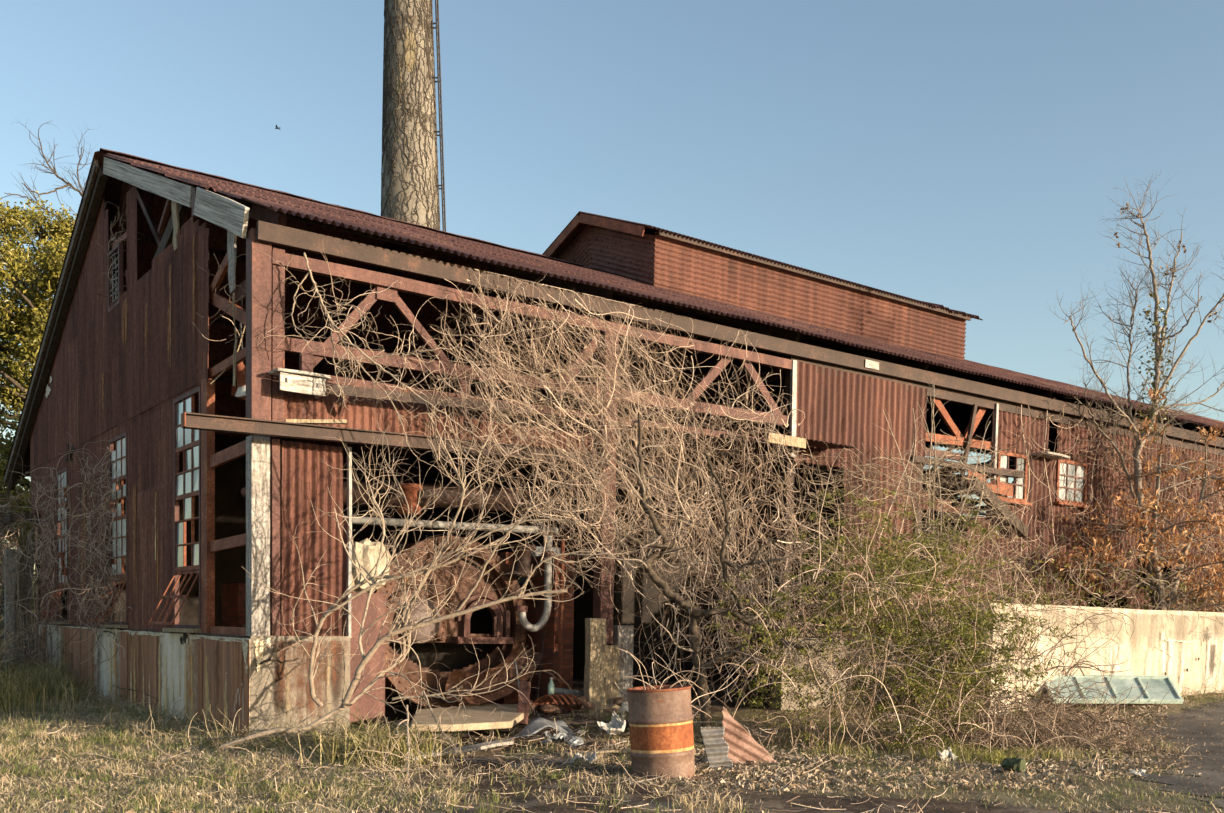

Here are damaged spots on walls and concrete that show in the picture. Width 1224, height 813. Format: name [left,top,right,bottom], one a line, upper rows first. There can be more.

corrosion [39,627,99,694]
corrosion [115,631,248,738]
leakage [275,666,290,713]
leakage [327,645,342,706]